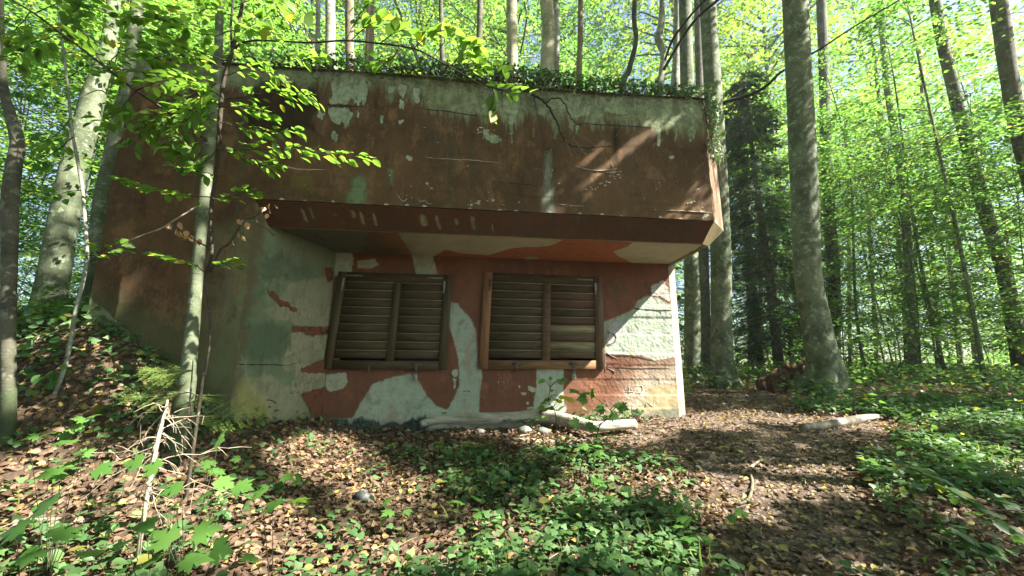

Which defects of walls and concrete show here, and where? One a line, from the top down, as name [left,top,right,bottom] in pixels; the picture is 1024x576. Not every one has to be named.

peeling [317,69,368,143]
peeling [477,88,703,147]
crack [581,122,652,132]
peeling [268,290,297,312]
peeling [651,280,670,301]
peeling [292,326,329,336]
peeling [607,320,625,345]
peeling [300,360,327,418]